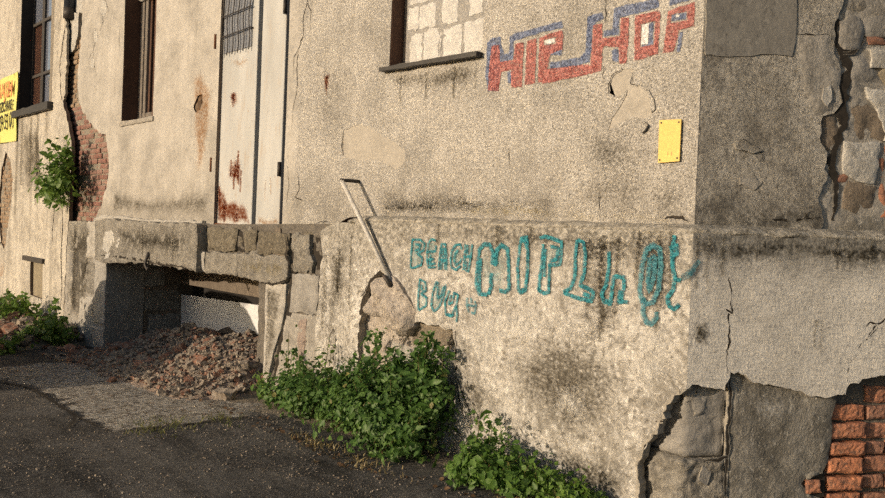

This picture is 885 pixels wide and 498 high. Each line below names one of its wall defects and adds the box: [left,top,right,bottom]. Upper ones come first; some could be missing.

flaking render [49,0,109,221]
flaking render [607,68,656,133]
flaking render [797,0,885,232]
flaking render [0,155,13,247]
corrosion [218,192,248,222]
leakage [813,246,884,262]
spalling [361,273,456,412]
spalling [635,385,707,498]
crack [703,277,734,498]
flaking render [801,375,885,498]
crack [844,317,885,394]